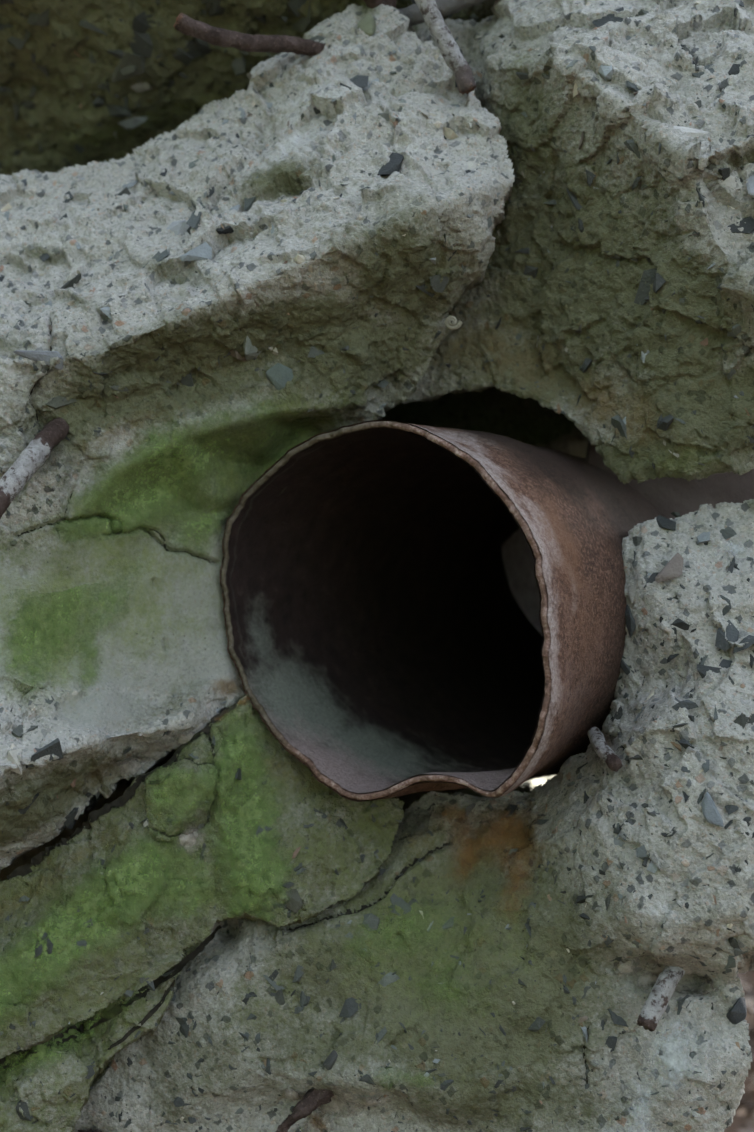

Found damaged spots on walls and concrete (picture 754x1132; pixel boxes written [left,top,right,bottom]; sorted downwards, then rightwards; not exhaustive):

spalling [86,161,227,234]
spalling [216,197,256,247]
spalling [319,152,404,226]
crack [18,490,215,563]
spalling [656,511,754,598]
spalling [605,536,754,840]
spalling [7,725,63,775]
crack [3,704,237,881]
damp [99,842,213,917]
damp [227,837,287,916]
crack [289,843,448,930]
crack [0,925,222,1069]